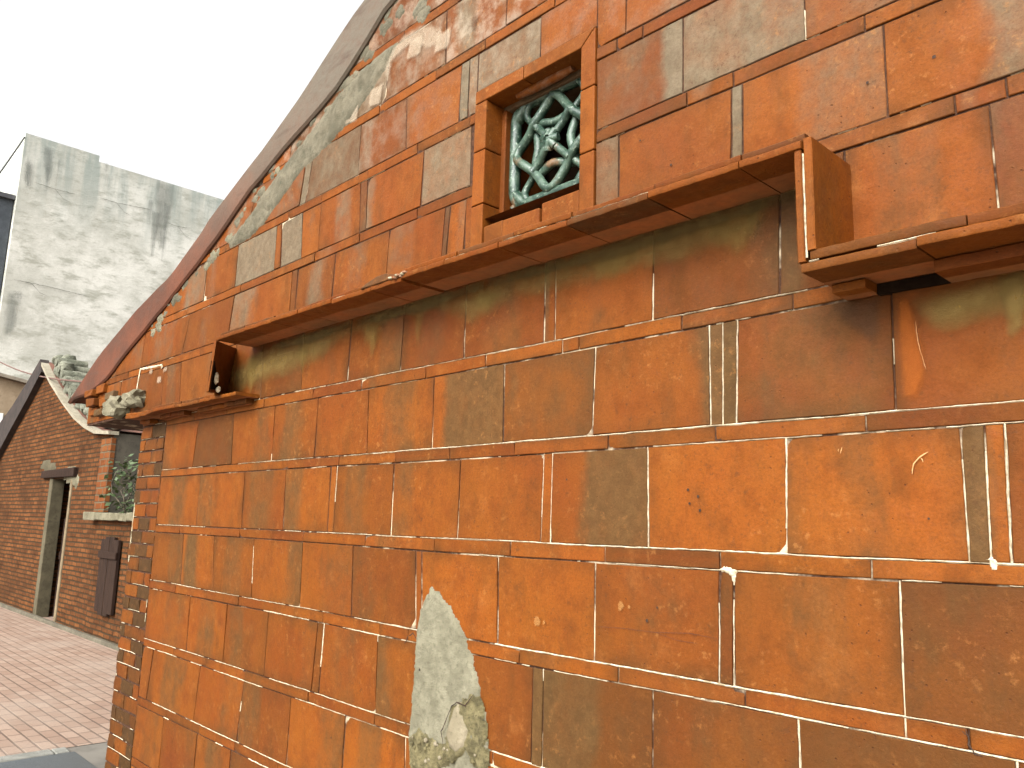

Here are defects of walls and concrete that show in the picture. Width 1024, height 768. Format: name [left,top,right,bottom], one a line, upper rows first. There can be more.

peeling [150,0,431,337]
damp [366,283,481,322]
spalling [408,694,490,768]